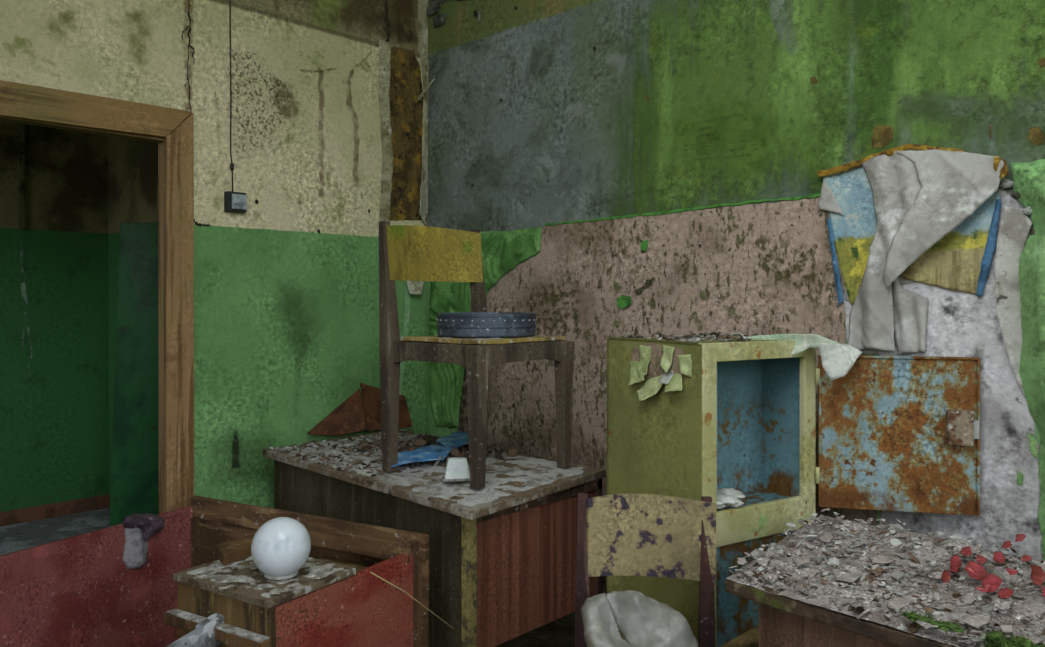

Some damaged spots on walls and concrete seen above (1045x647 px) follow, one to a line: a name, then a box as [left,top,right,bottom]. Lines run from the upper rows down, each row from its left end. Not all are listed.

crack [181,0,195,111]
flaking render [379,0,463,226]
flaking render [402,281,425,337]
peeling [457,367,468,433]
peeling [486,193,854,496]
flaking render [816,189,1042,561]